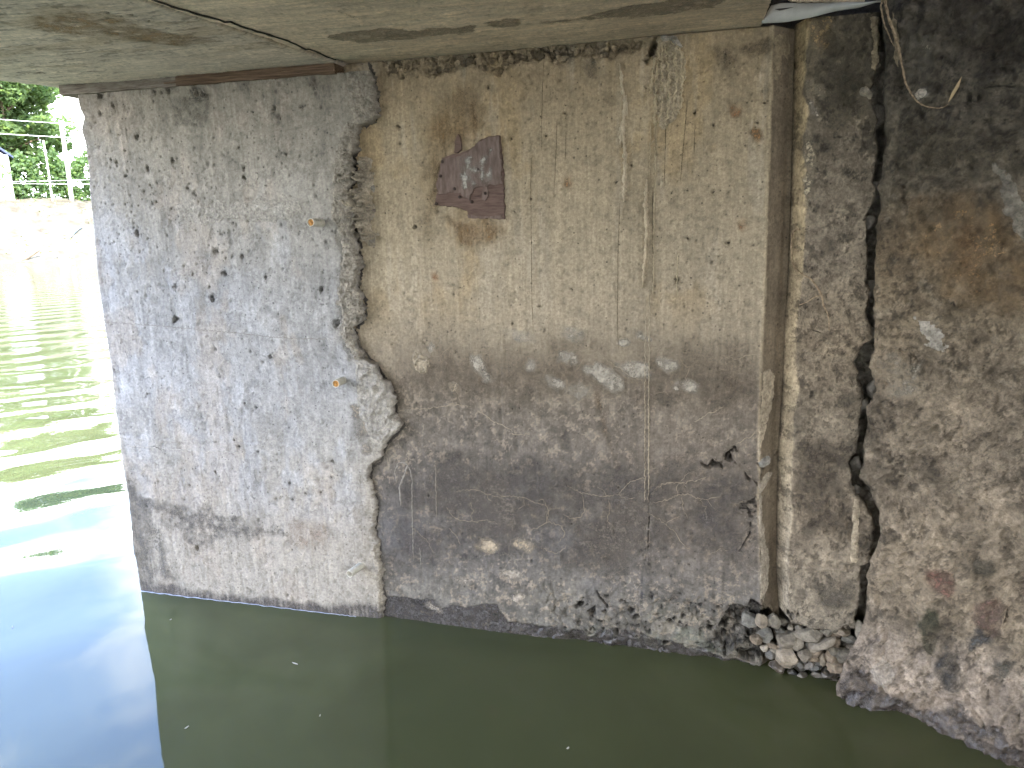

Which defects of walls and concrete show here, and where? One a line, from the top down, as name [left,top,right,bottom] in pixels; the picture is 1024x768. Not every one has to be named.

crack [152,0,336,60]
spalling [317,34,676,365]
damp [393,35,686,569]
crack [848,24,887,636]
crack [413,472,756,570]
spalling [561,369,802,666]
spalling [370,543,383,612]
flaking render [918,609,958,691]
flaking render [969,600,1005,650]
flaking render [994,661,1016,678]